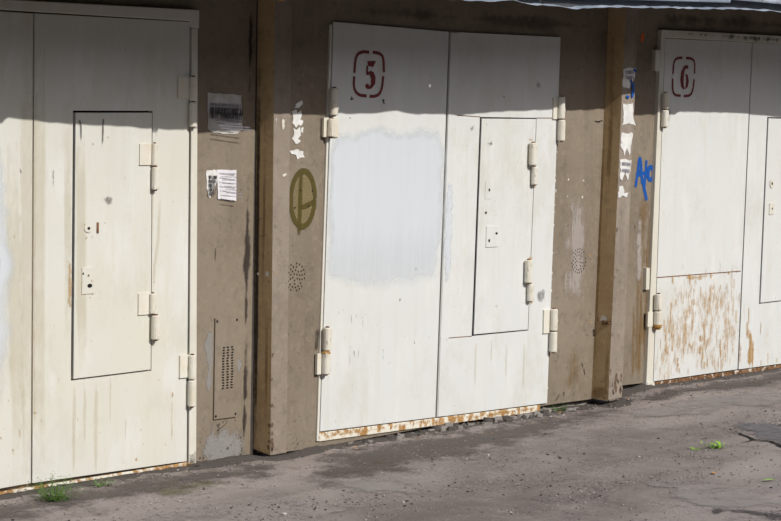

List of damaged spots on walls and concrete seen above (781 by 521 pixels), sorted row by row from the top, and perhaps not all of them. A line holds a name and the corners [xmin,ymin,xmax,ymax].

corrosion [653,275,734,369]